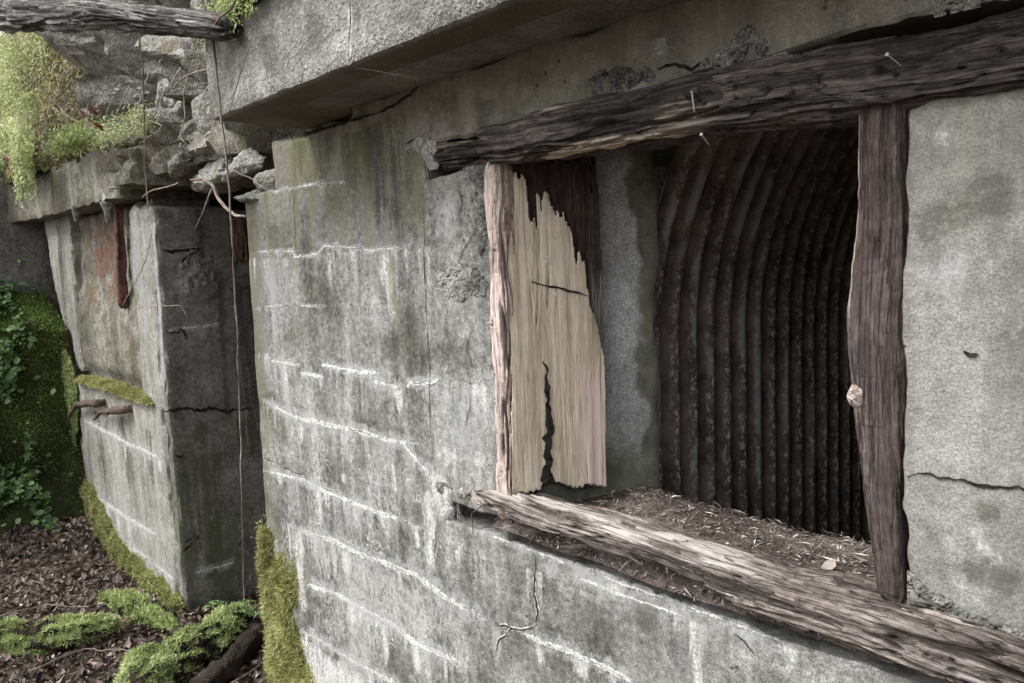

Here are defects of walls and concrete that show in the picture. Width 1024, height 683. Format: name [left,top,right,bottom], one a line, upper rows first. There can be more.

crack [657,62,701,72]
spalling [588,65,656,96]
spalling [408,134,439,170]
crack [162,248,200,263]
crack [162,403,271,414]
crack [905,472,1024,491]
crack [435,561,635,683]